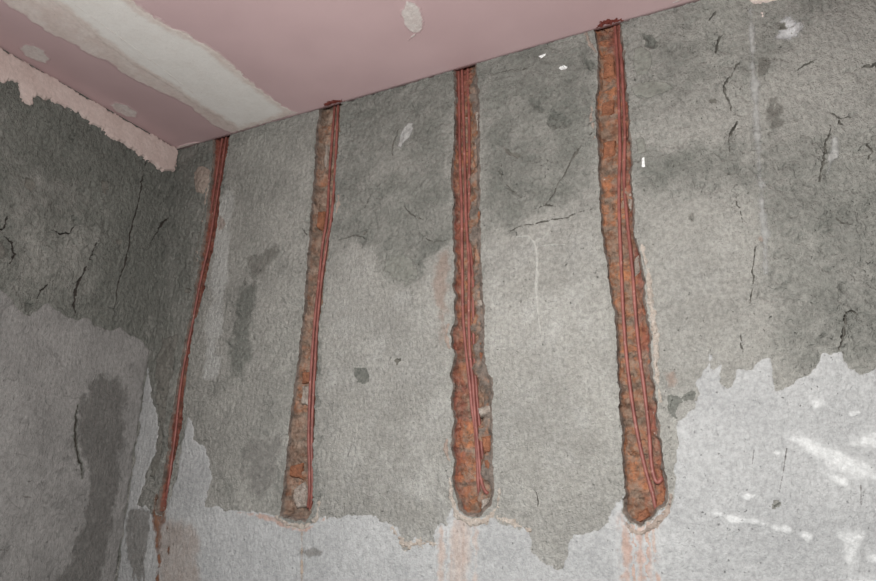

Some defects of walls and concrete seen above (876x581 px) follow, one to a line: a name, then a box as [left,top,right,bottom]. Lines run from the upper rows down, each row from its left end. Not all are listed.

crack [709,11,723,53]
crack [861,61,876,69]
crack [723,63,742,152]
crack [818,113,852,182]
crack [0,216,16,264]
crack [72,241,99,313]
crack [113,162,169,317]
crack [748,247,756,303]
crack [74,405,82,475]
rust [608,496,670,581]